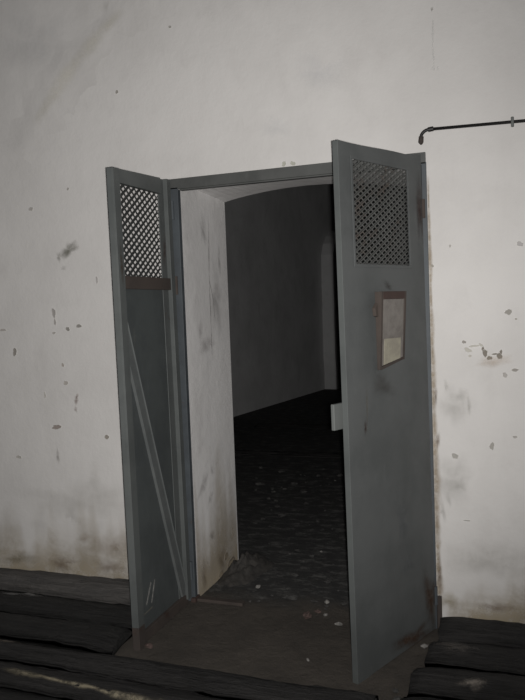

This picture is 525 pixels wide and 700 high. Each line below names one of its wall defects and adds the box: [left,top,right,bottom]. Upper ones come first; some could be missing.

spalling [462,340,503,360]
water stain [10,555,99,577]
water stain [198,526,238,596]
water stain [468,607,525,623]